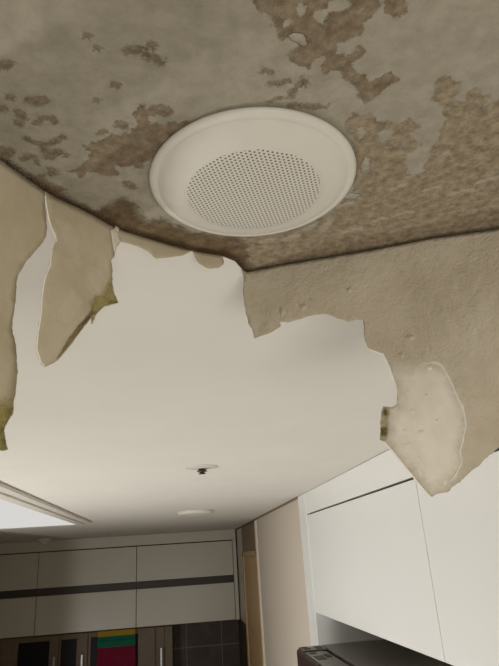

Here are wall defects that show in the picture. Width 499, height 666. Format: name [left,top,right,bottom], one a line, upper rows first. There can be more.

peeling [121,40,168,67]
peeling [0,103,193,191]
leakage [0,157,499,272]
leakage [58,283,117,358]
mould [0,404,12,450]